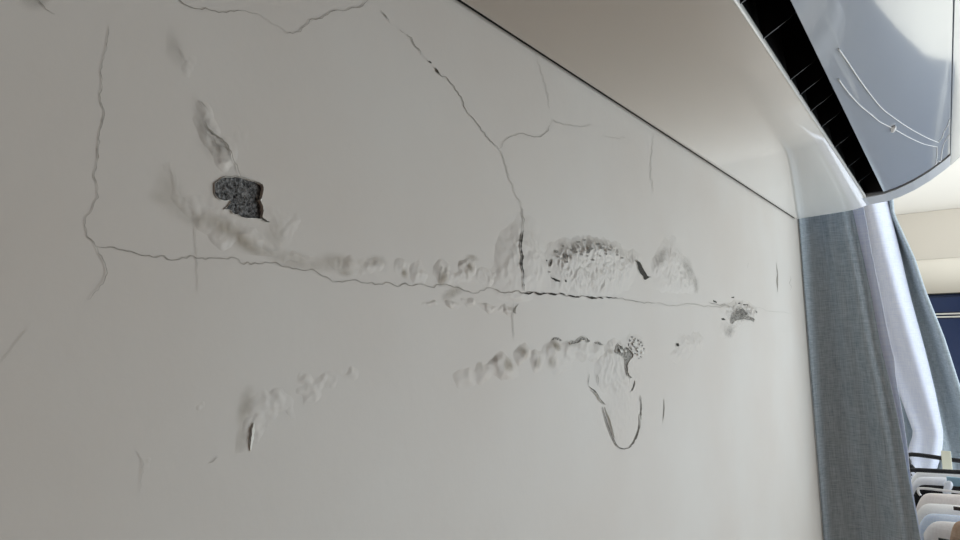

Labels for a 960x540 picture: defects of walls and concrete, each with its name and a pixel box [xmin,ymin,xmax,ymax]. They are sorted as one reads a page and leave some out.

crack [84,0,792,341]
flaking render [214,176,269,223]
flaking render [721,297,755,324]
flaking render [615,336,644,391]
peeling [588,374,642,449]